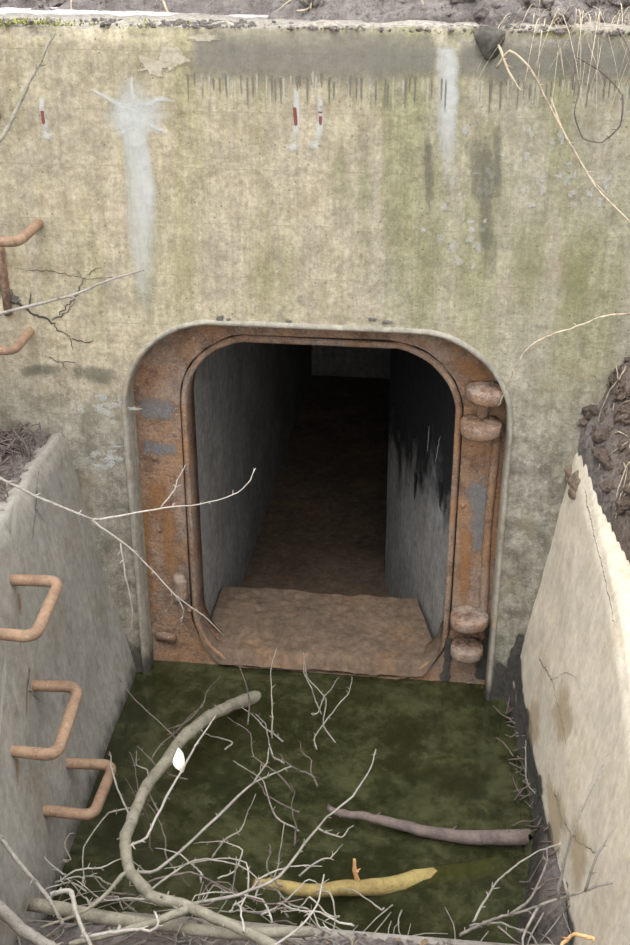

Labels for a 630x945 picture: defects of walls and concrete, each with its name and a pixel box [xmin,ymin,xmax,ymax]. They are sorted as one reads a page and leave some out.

leakage [187,32,630,142]
crack [11,267,122,369]